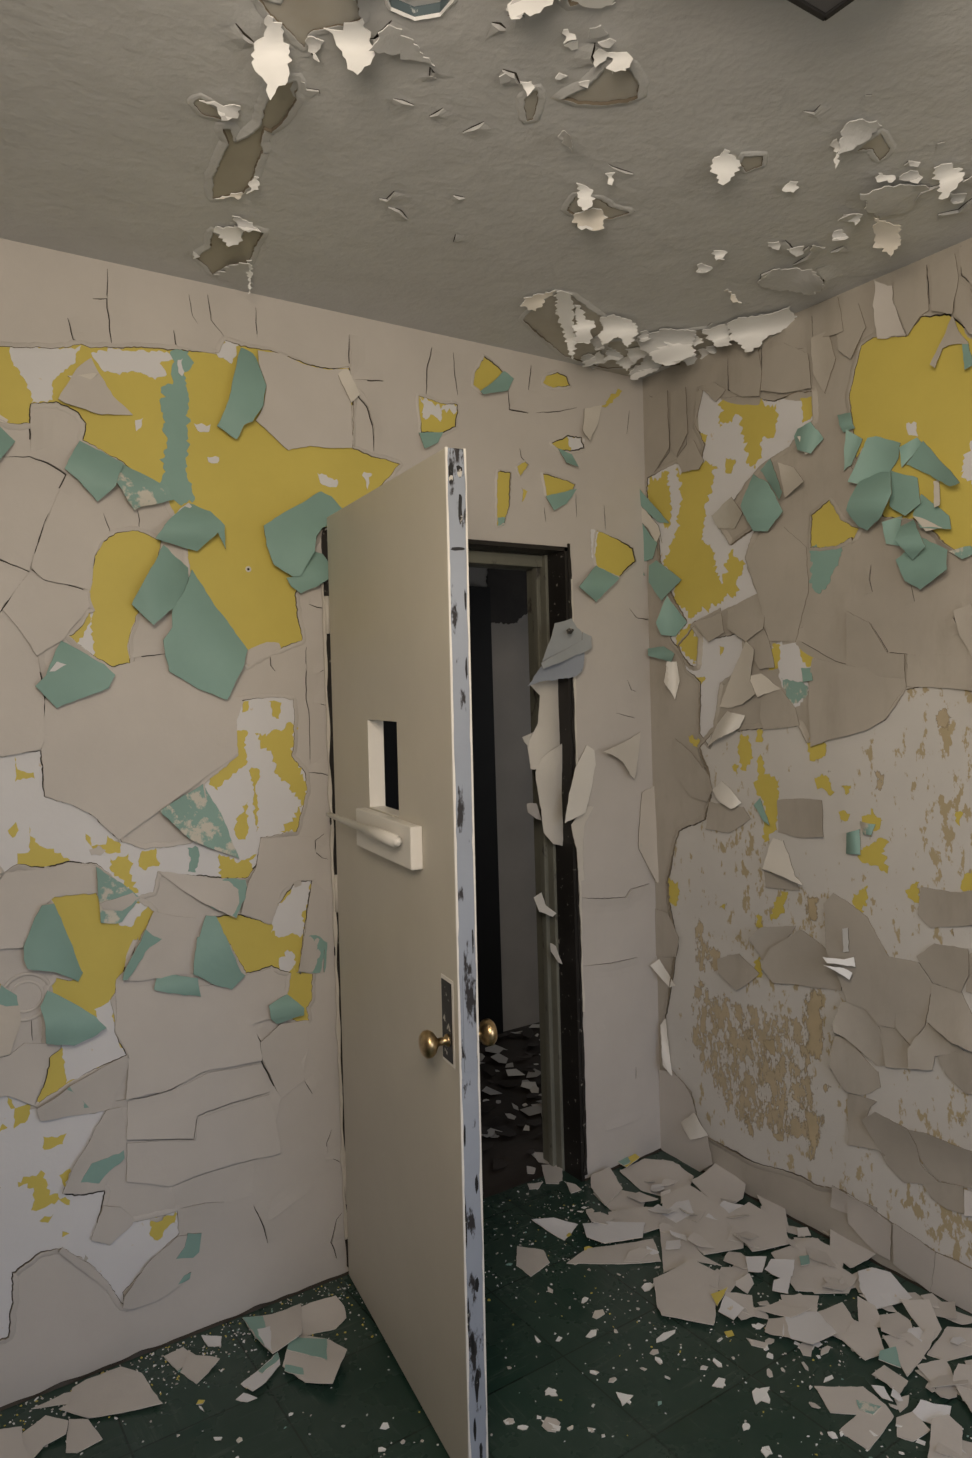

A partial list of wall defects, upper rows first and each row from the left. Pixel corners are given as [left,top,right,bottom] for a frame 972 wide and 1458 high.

peeling [0,336,403,1345]